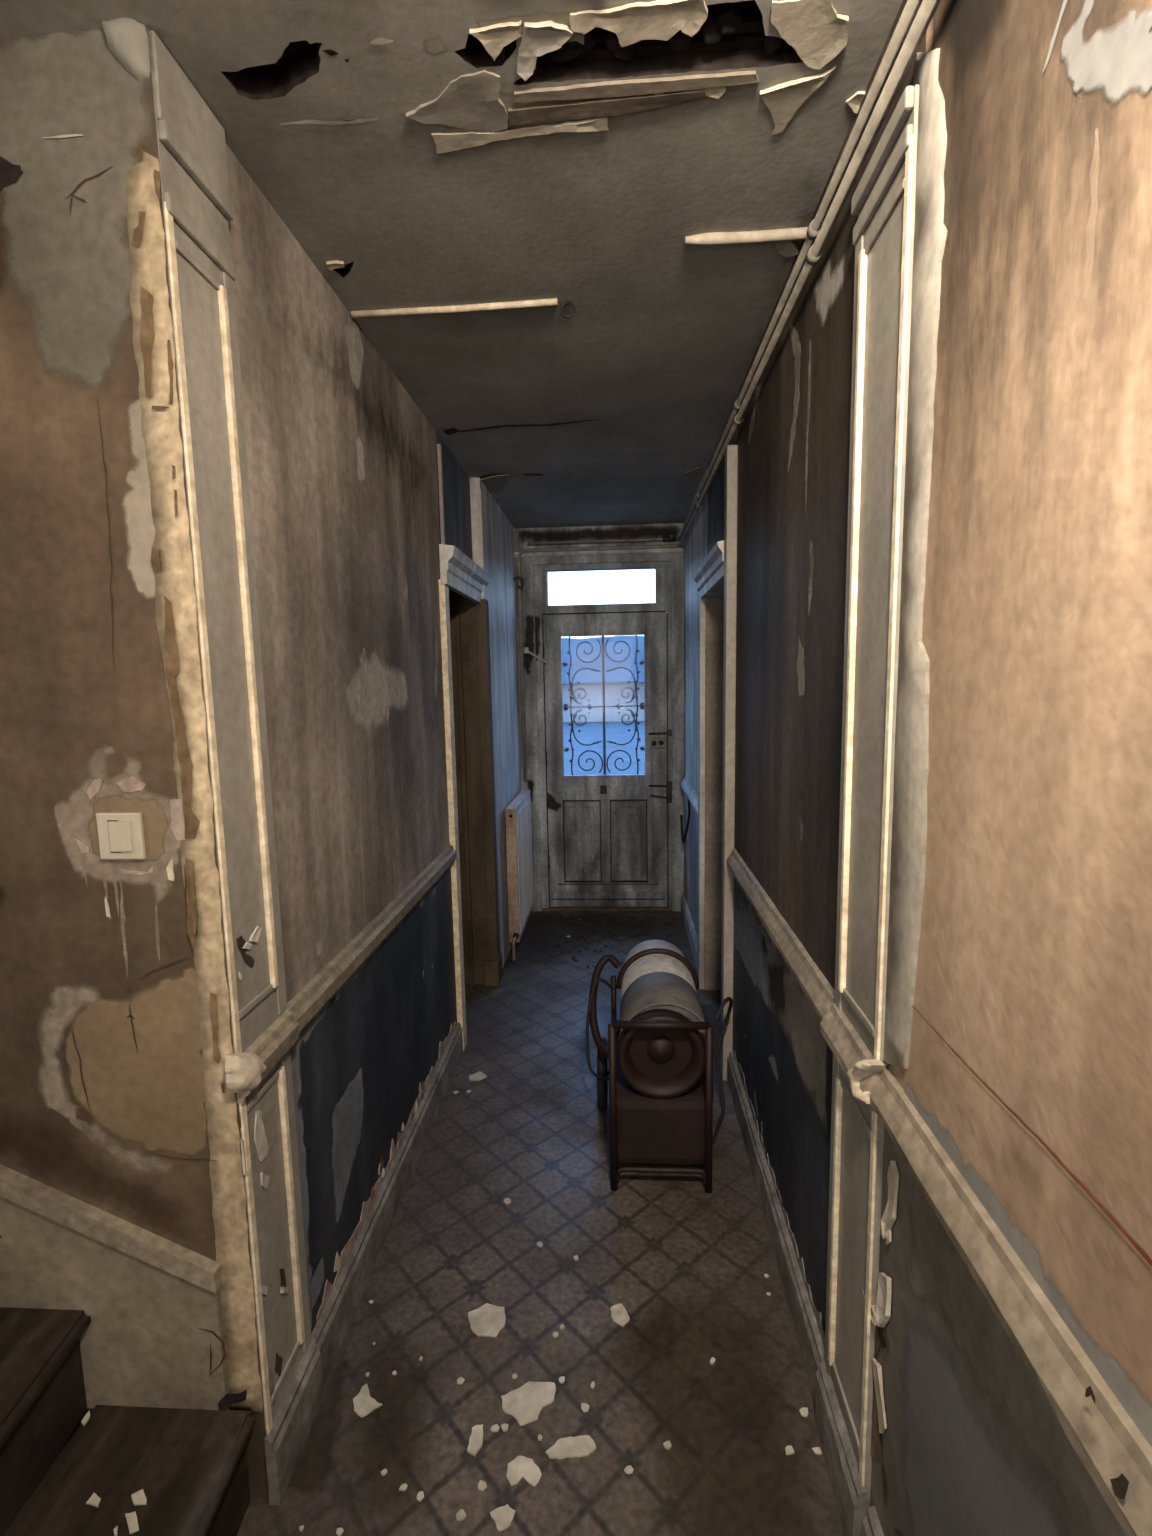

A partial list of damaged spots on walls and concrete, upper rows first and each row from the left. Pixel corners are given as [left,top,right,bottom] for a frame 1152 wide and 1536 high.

flaking render [221,40,349,100]
flaking render [406,0,849,154]
flaking render [846,91,865,113]
flaking render [0,156,23,191]
spalling [132,212,146,247]
spalling [140,286,174,410]
spalling [164,596,200,839]
spalling [237,926,262,980]
spalling [210,992,221,1063]
flaking render [881,1161,899,1245]
flaking render [861,1273,892,1502]
leakage [907,1180,1126,1536]